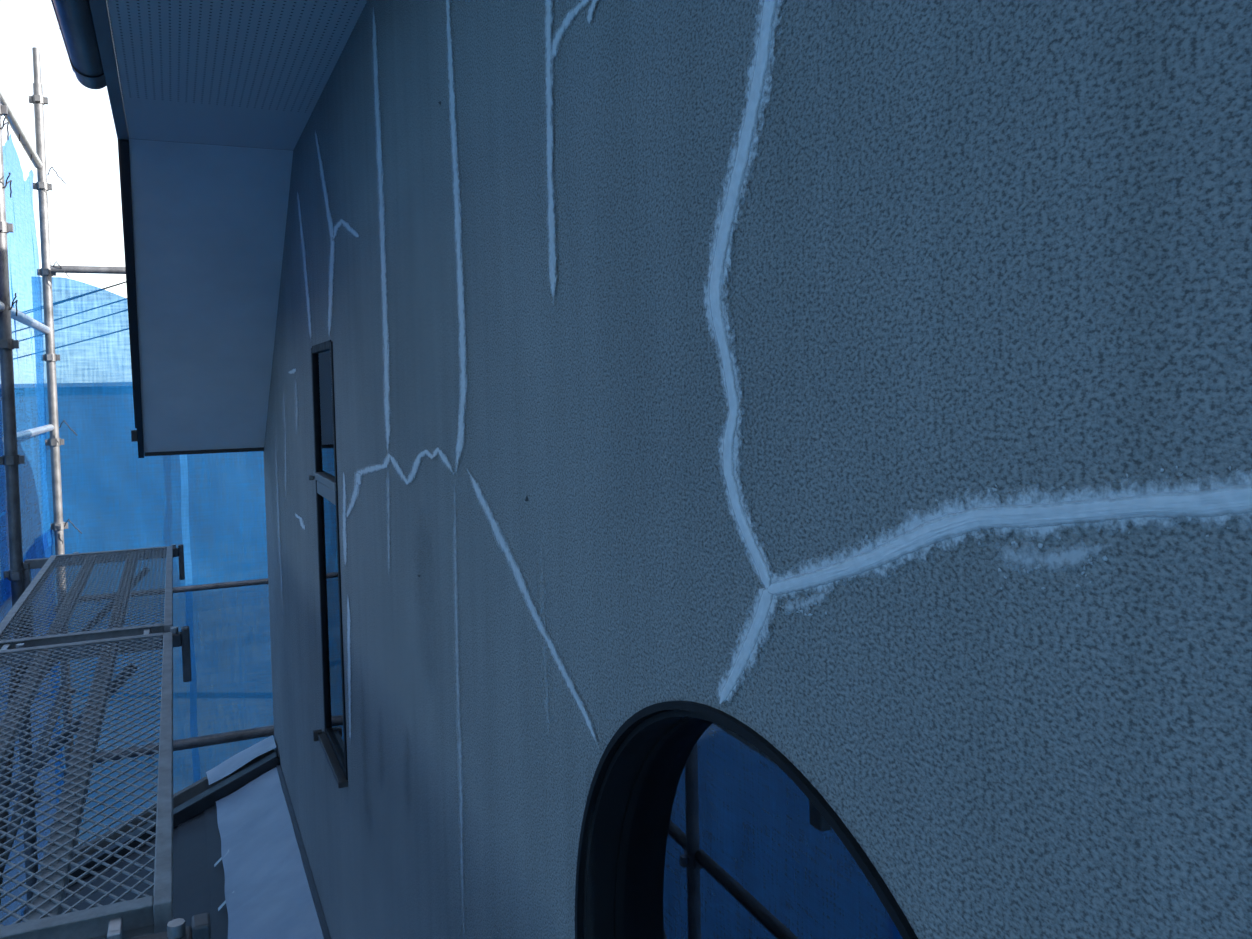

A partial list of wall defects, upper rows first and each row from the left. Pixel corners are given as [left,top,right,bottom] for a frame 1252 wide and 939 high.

crack [276,368,305,590]
crack [297,0,598,741]
crack [454,531,463,888]
crack [704,0,1252,704]